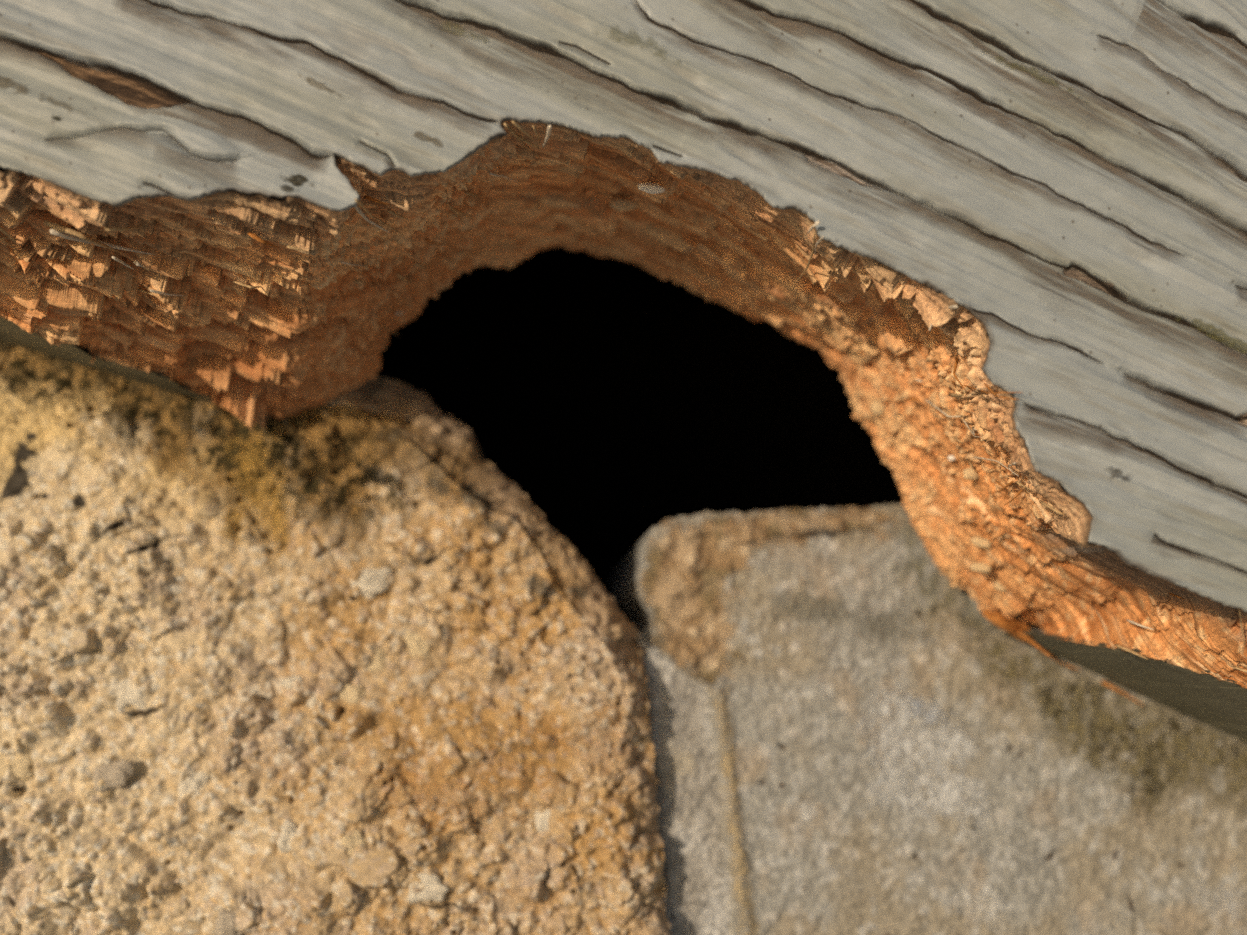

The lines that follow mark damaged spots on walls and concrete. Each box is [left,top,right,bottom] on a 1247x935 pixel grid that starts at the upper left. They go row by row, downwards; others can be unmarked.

crack [396,0,1247,365]
crack [1127,378,1247,425]
spalling [1,433,37,500]
leakage [367,466,391,485]
crack [1024,403,1247,504]
spalling [73,494,86,507]
crack [797,530,835,538]
crack [1153,534,1247,573]
spalling [641,506,903,684]